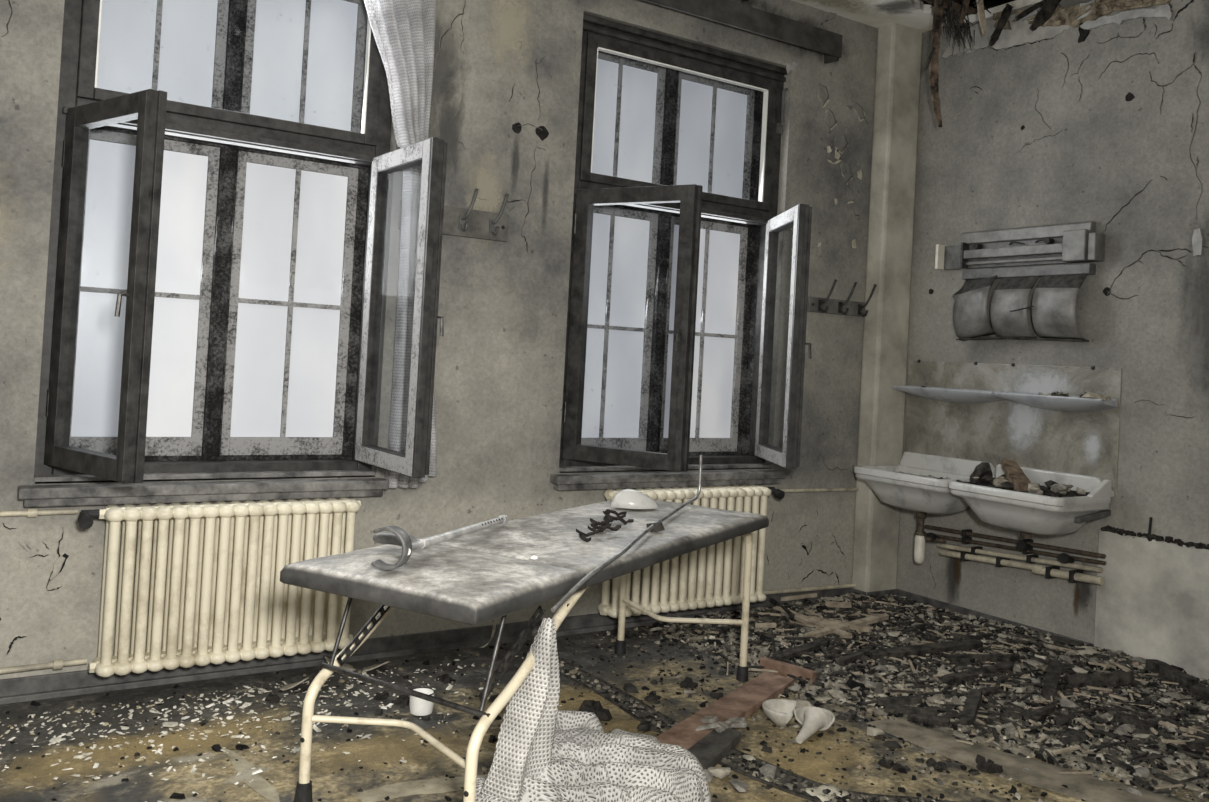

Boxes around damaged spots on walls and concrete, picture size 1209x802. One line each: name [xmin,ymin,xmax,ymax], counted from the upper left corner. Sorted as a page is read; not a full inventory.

crack [433,0,466,71]
spalling [942,0,1173,58]
crack [476,41,546,253]
crack [942,0,1209,300]
crack [0,522,64,591]
crack [0,616,27,655]